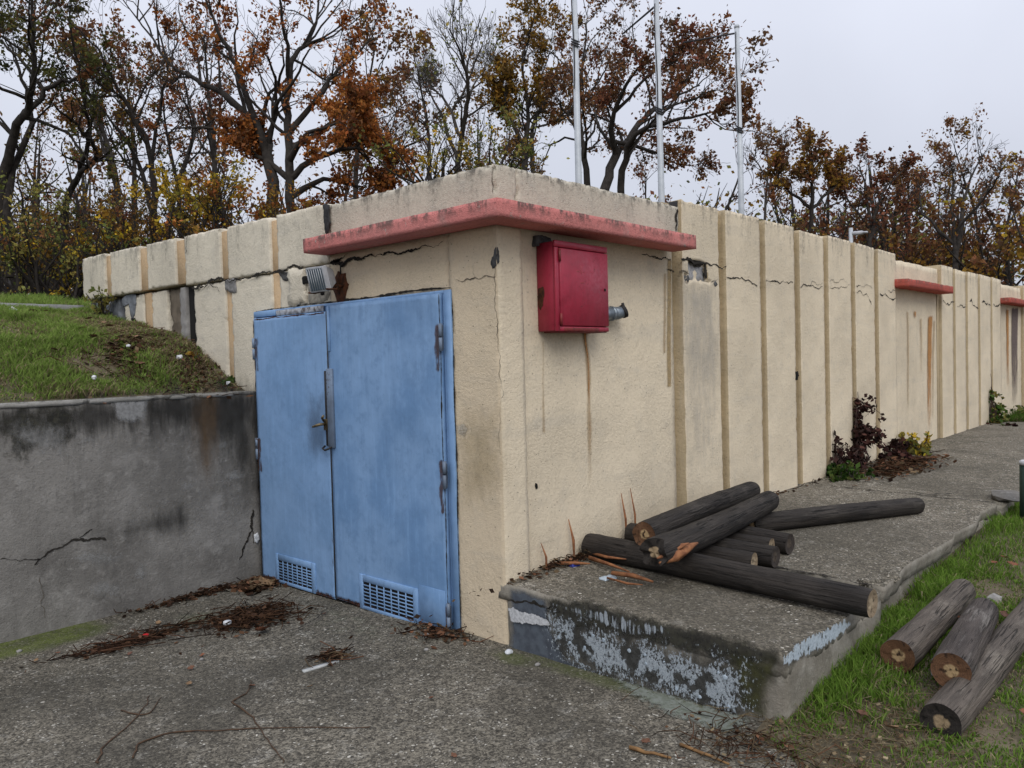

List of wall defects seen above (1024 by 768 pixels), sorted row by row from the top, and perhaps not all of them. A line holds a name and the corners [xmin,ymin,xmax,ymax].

crack [191,264,303,291]
crack [330,241,443,267]
spalling [684,260,718,287]
crack [642,254,896,305]
damp [0,390,257,465]
crack [239,510,254,560]
crack [1,529,106,616]
peeling [508,591,763,716]